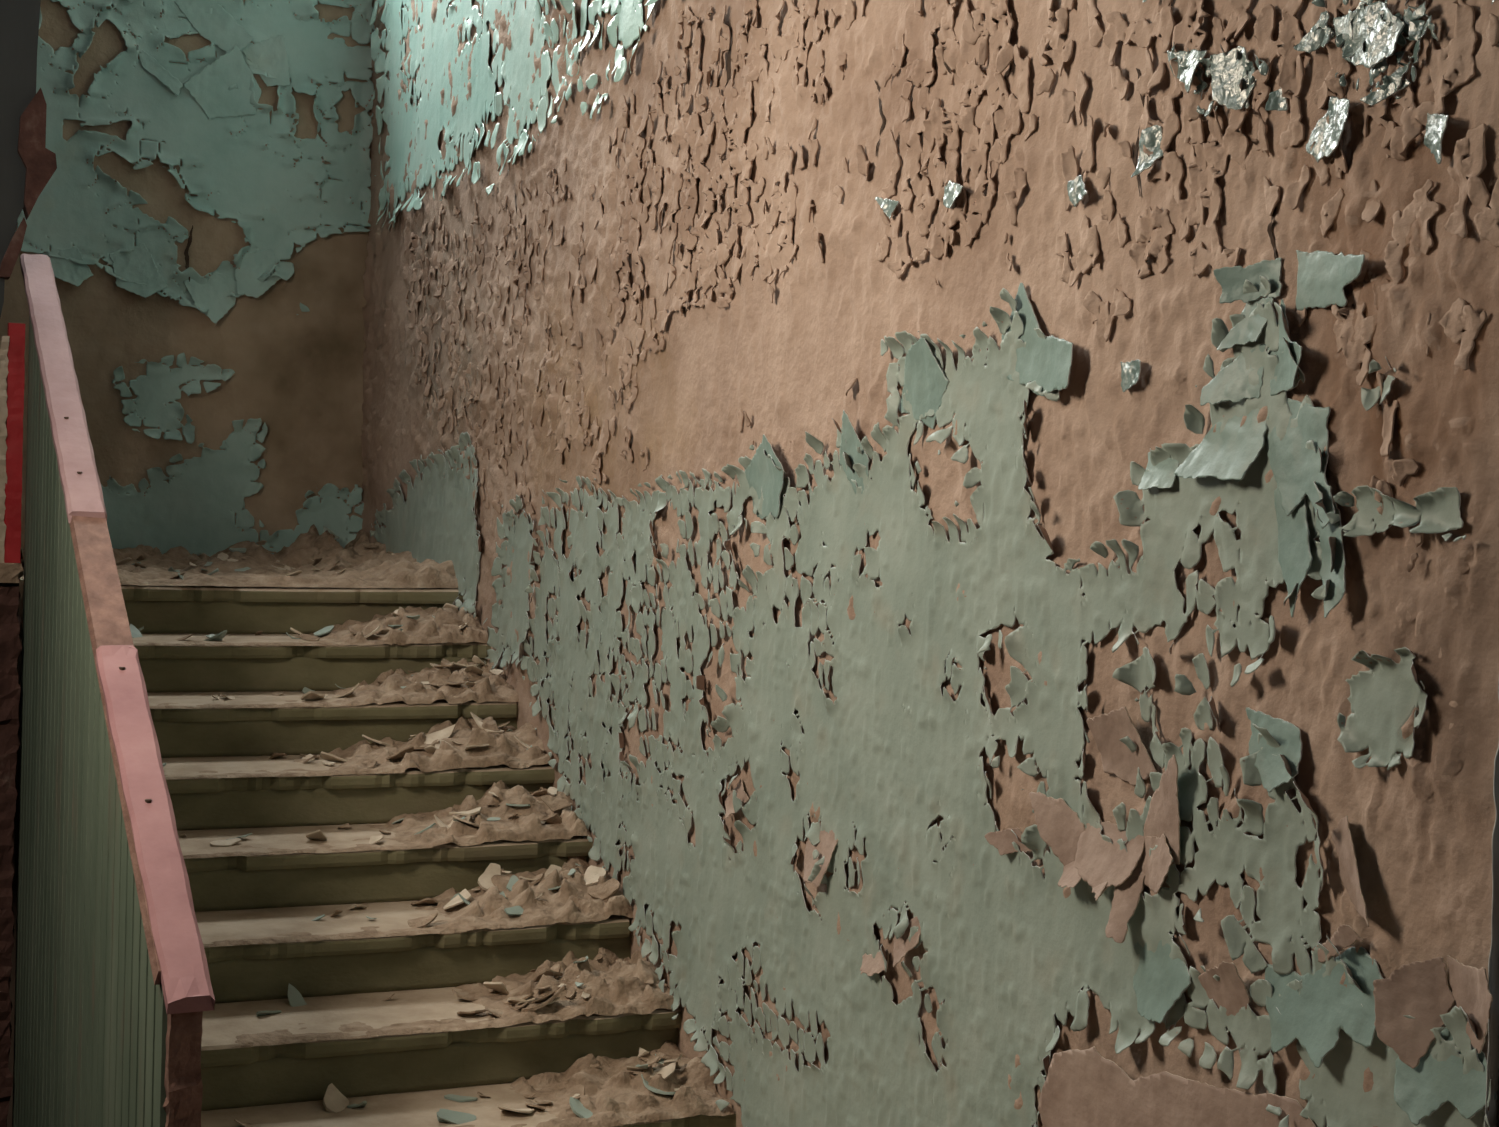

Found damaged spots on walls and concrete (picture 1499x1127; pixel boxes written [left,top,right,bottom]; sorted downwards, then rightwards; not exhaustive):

spalling [38,0,83,54]
spalling [65,19,128,100]
spalling [164,33,211,59]
spalling [314,1,355,23]
spalling [334,89,366,133]
spalling [17,88,57,220]
spalling [93,151,251,276]
spalling [0,251,37,563]
peeling [112,353,235,444]
peeling [101,418,266,557]
spalling [715,1077,743,1127]
spalling [1363,1067,1374,1092]